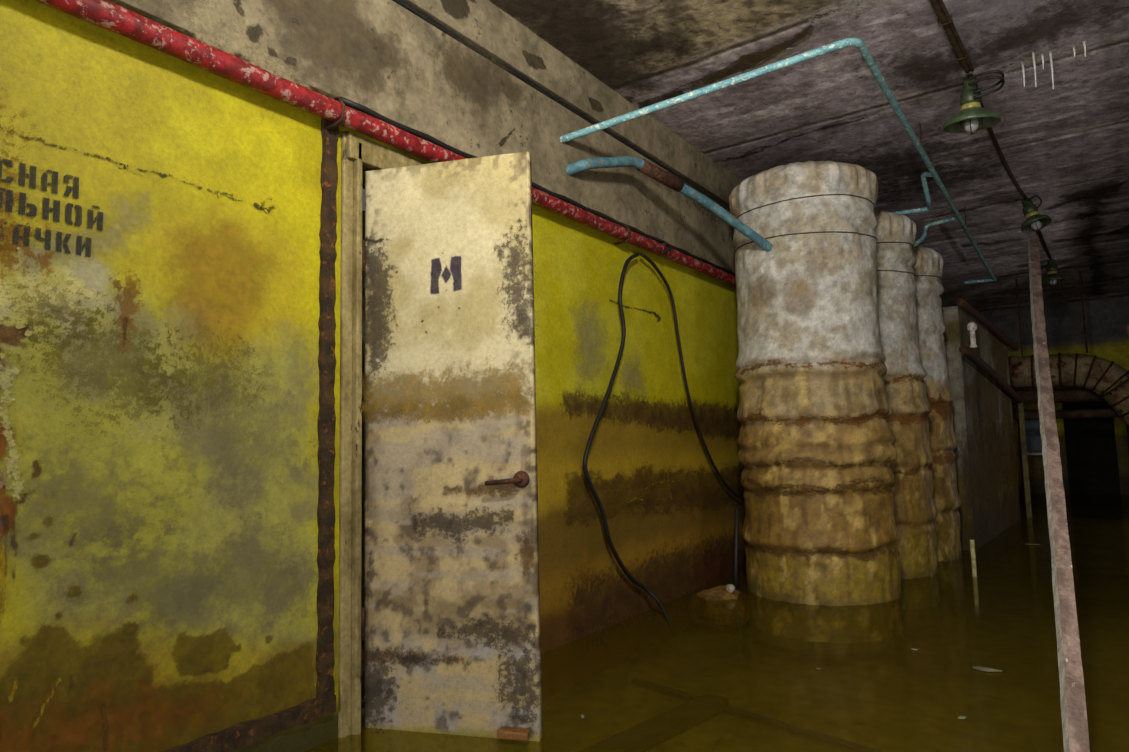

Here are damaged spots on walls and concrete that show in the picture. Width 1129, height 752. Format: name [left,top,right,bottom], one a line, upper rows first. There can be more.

leakage [490,0,694,100]
leakage [890,0,1129,94]
crack [1,127,274,213]
leakage [831,127,1003,208]
peeling [0,182,54,278]
peeling [0,323,32,540]
leakage [560,389,742,440]
leakage [410,504,514,544]
leakage [564,462,745,526]
leakage [565,533,747,651]
leakage [0,612,317,752]
mould [361,648,403,734]